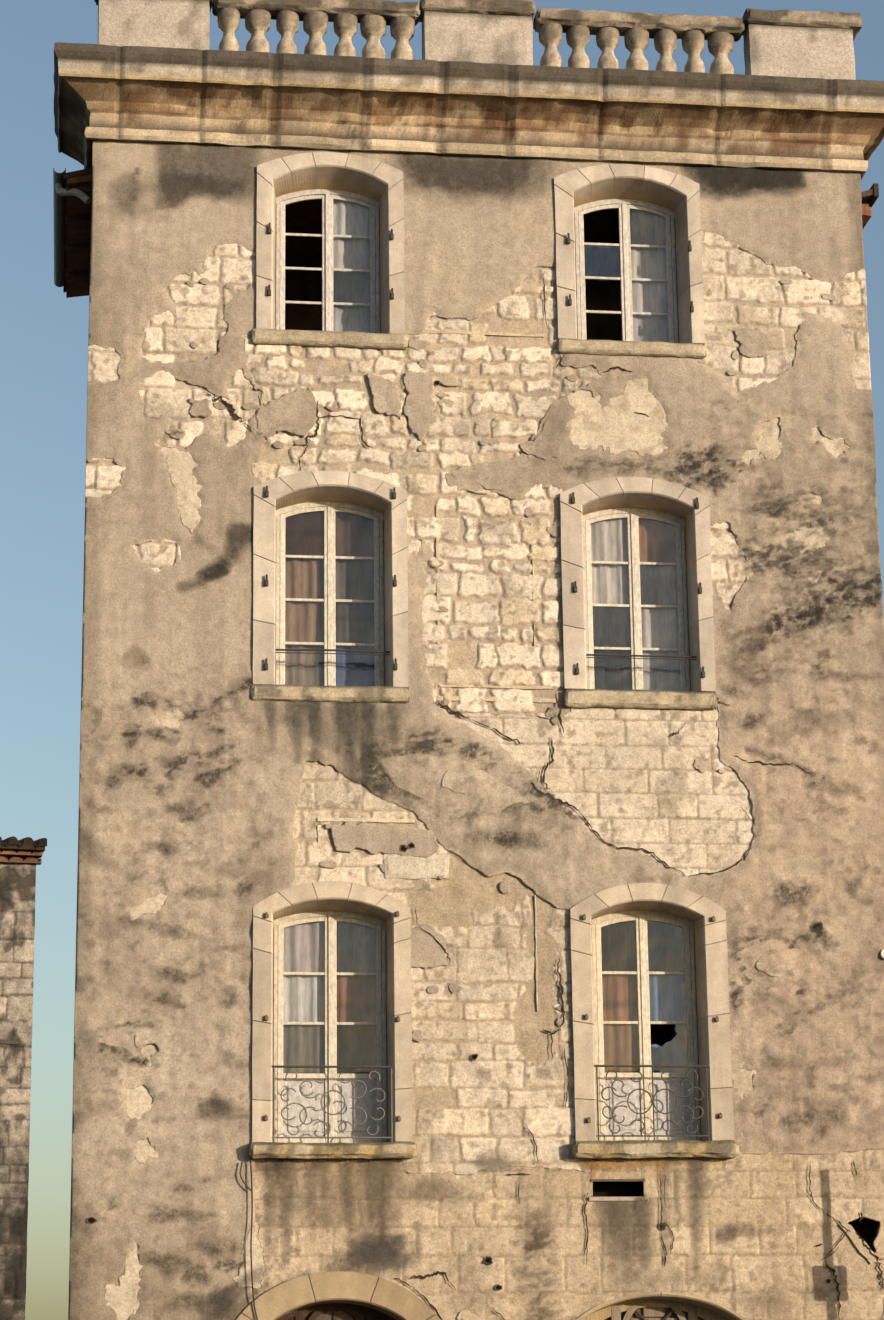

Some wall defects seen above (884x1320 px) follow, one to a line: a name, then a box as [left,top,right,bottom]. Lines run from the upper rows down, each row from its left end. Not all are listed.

damp [160,143,254,206]
spalling [697,232,871,392]
damp [182,524,253,588]
spalling [139,244,754,877]
crack [437,692,753,876]
spalling [292,761,591,1176]
crack [544,958,569,1107]
peeling [104,1245,143,1320]
damp [338,1234,410,1272]
crack [395,1271,463,1320]
crack [809,1166,884,1318]
spalling [848,1217,880,1252]